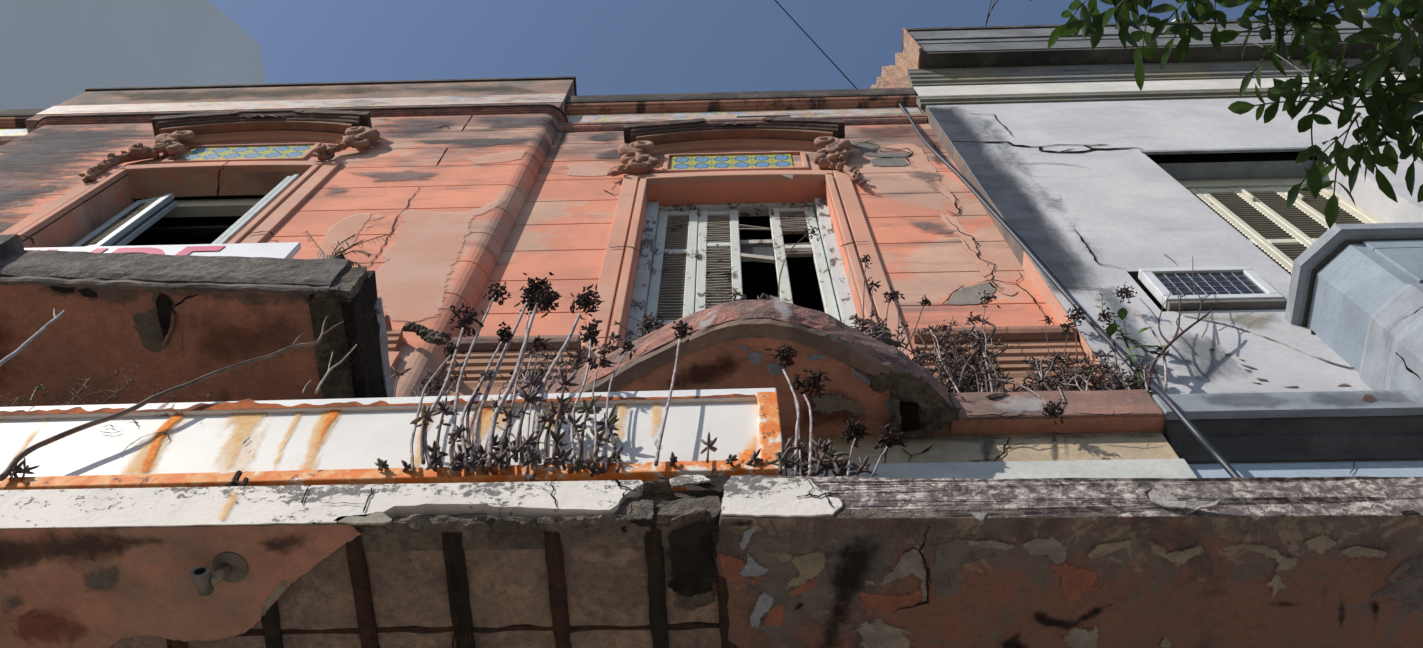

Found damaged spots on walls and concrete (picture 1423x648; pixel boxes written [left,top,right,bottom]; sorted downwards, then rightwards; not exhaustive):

crack [952,113,1143,167]
leakage [0,125,148,231]
crack [946,192,1055,326]
crack [1074,229,1125,289]
peeling [308,198,504,399]
corrosion [126,414,184,474]
corrosion [225,412,266,467]
corrosion [302,410,340,470]
corrosion [472,406,511,436]
peeling [1145,487,1222,515]
spalling [105,475,826,648]
peeling [852,618,914,648]